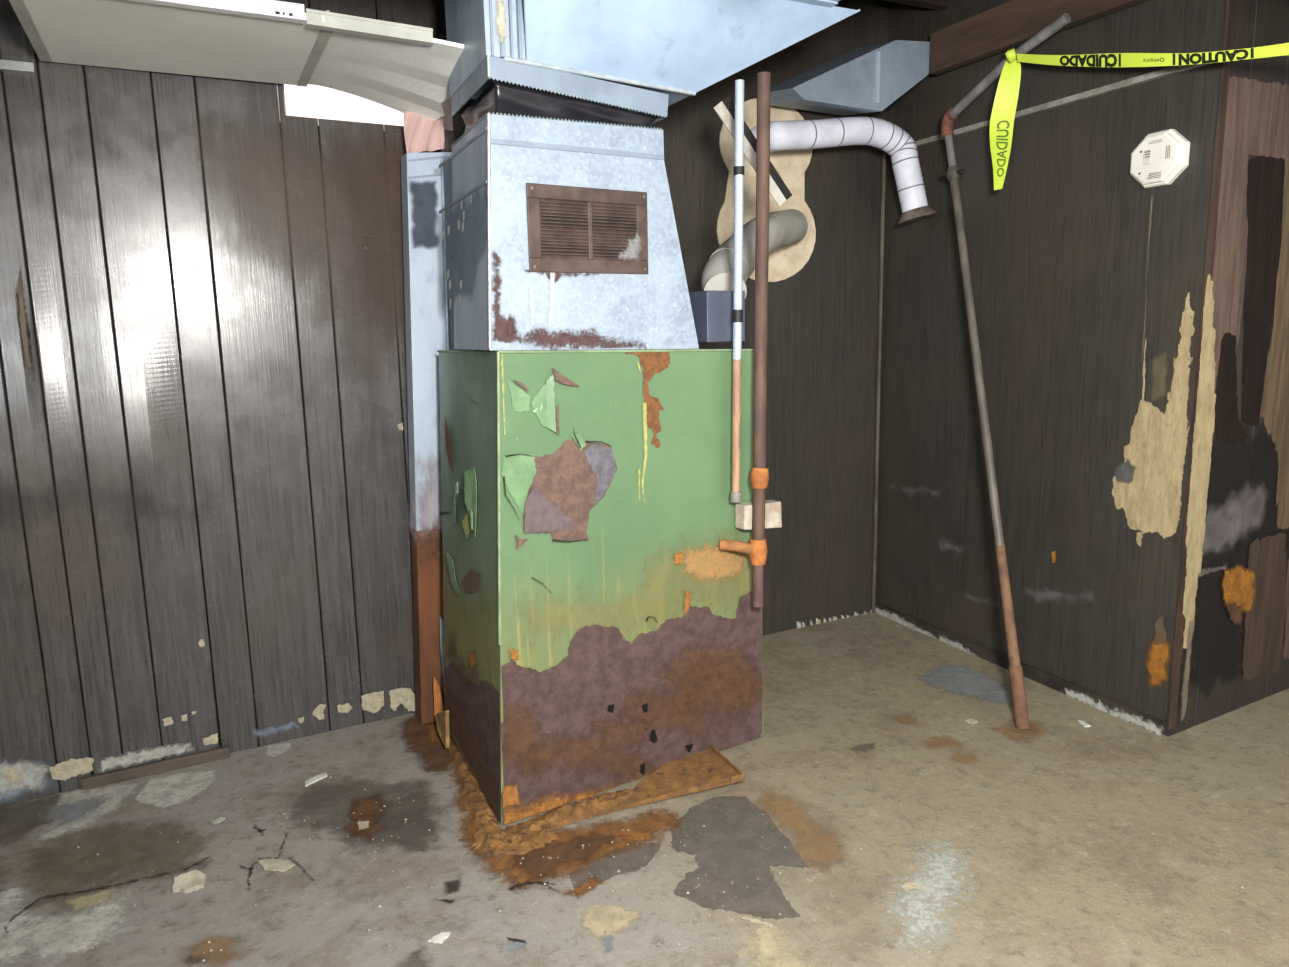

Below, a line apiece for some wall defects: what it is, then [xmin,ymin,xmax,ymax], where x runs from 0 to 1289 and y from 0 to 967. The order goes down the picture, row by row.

peeling [1112,293,1195,547]
corrosion [1222,566,1255,624]
corrosion [1147,616,1169,686]
peeling [163,711,196,726]
peeling [254,688,416,758]
corrosion [401,527,763,897]
water stain [0,761,47,801]
spalling [35,733,218,842]
crack [240,826,314,890]
water stain [570,796,809,920]
crack [5,857,209,933]